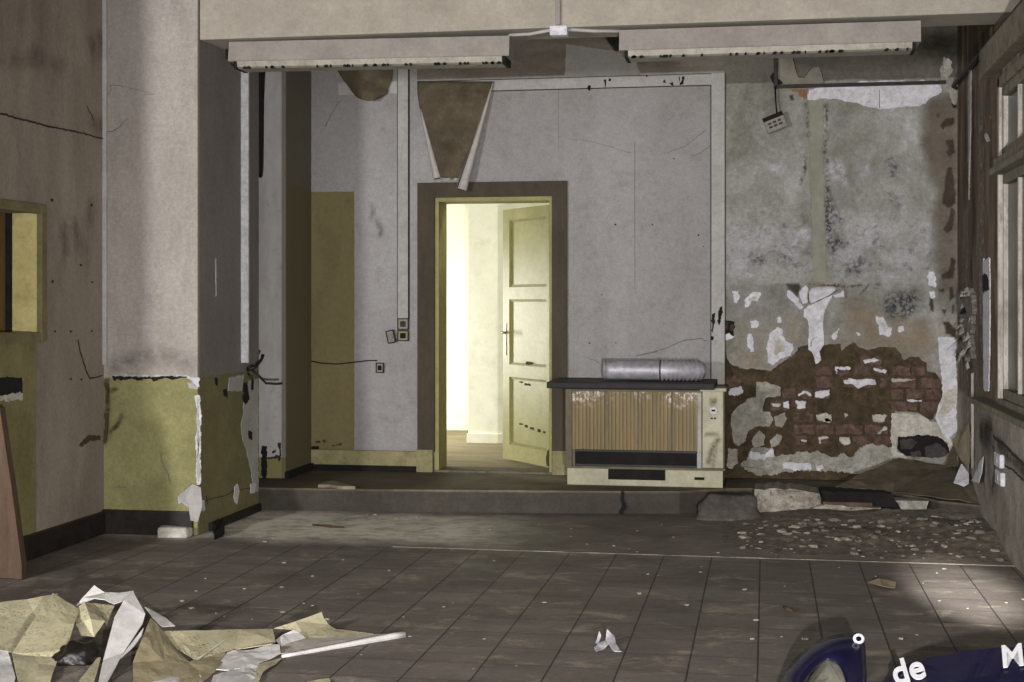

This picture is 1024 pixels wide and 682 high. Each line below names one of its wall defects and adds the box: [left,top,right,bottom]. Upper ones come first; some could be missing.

crack [0,85,154,139]
flaking render [215,375,281,504]
crack [619,491,627,514]
spalling [725,285,949,480]